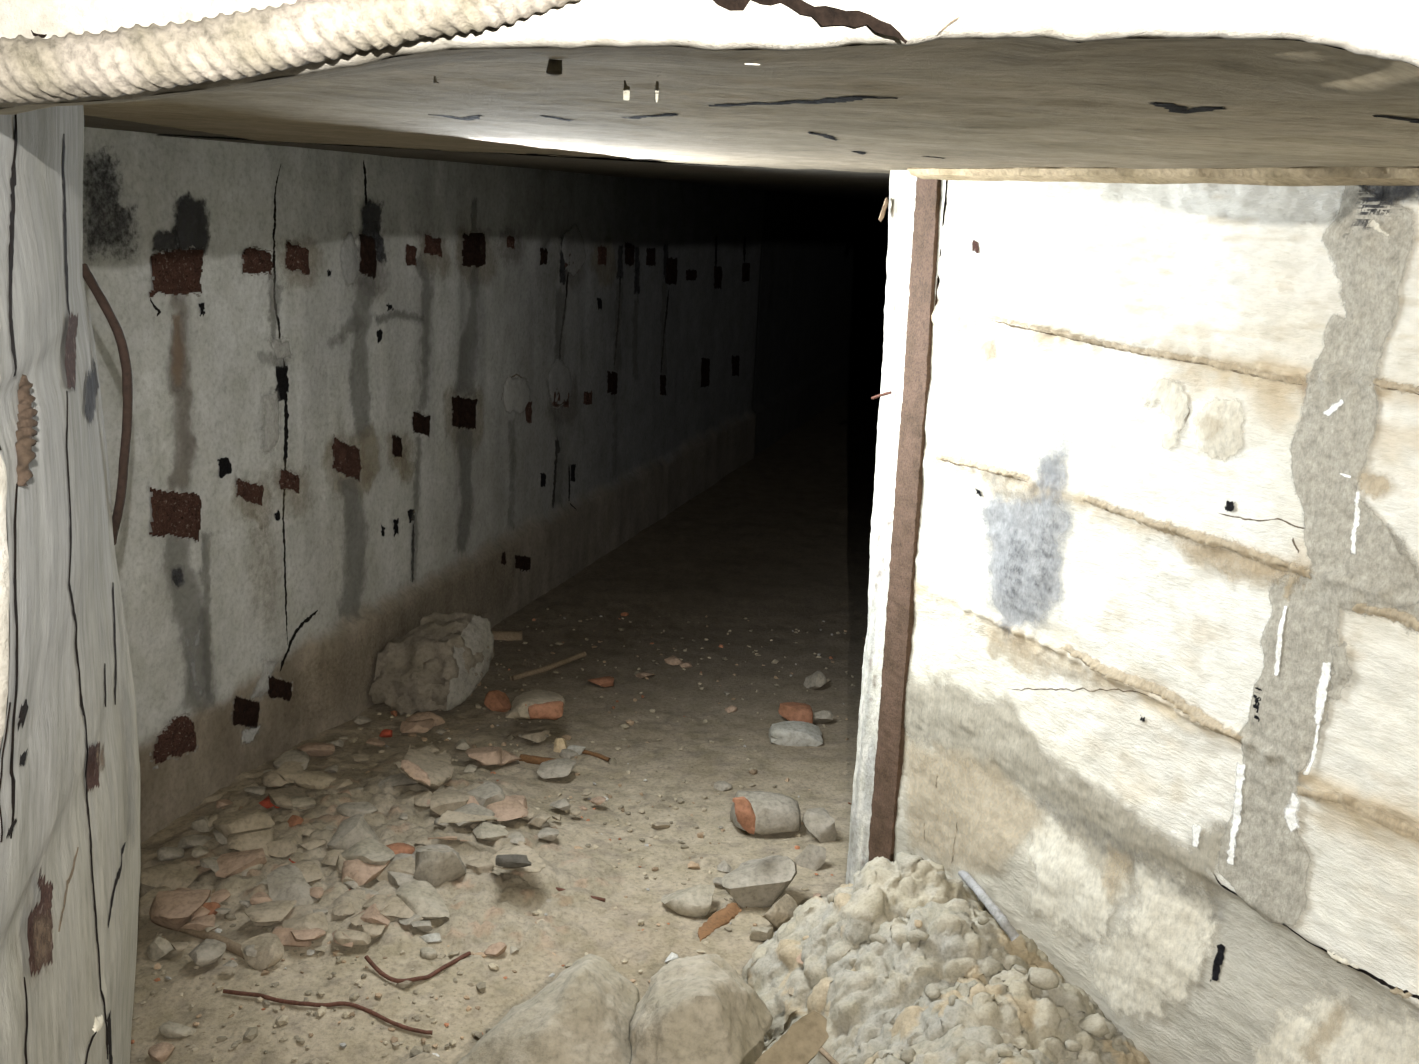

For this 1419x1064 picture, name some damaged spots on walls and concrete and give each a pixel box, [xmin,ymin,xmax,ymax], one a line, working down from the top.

crack [713,0,907,44]
crack [622,96,898,155]
crack [8,114,17,377]
crack [62,134,70,314]
crack [272,165,318,671]
damp [1389,530,1419,581]
crack [0,484,28,842]
crack [58,391,126,1064]
rust [86,741,105,791]
rust [27,868,53,977]
crack [1282,923,1419,999]
crack [22,977,30,1064]